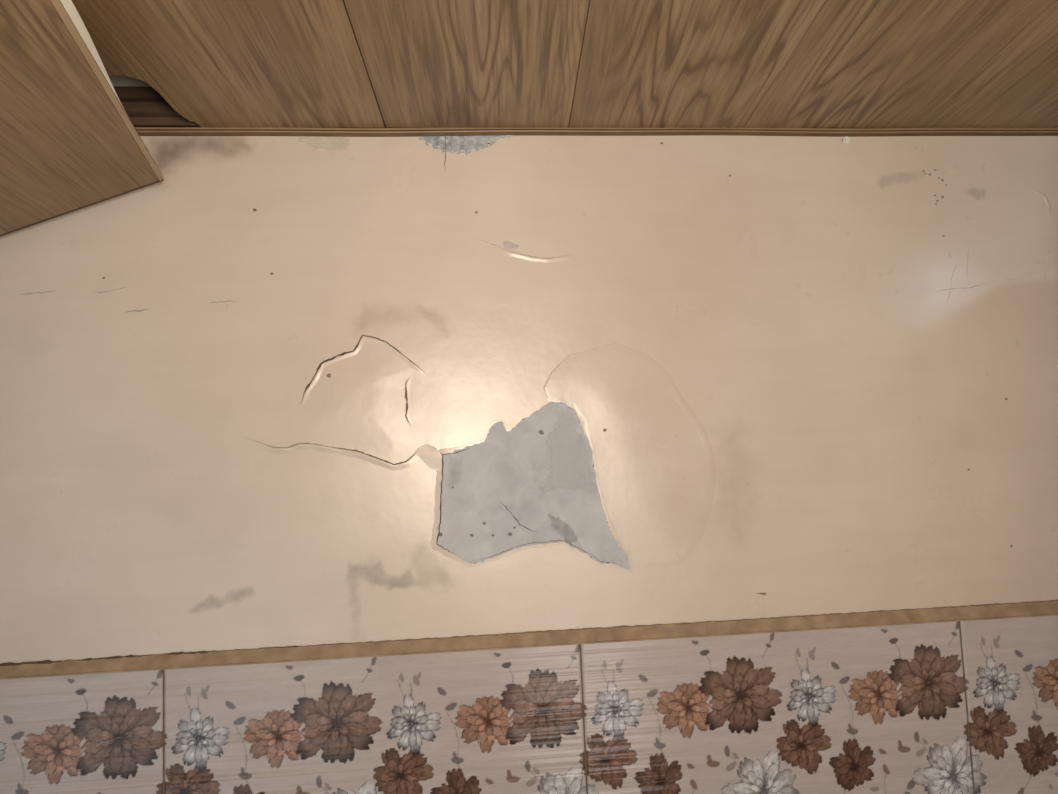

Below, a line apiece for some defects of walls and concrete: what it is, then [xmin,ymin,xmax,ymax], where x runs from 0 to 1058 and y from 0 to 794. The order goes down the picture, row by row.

spalling [416,135,517,165]
crack [236,335,426,471]
spalling [416,398,633,573]